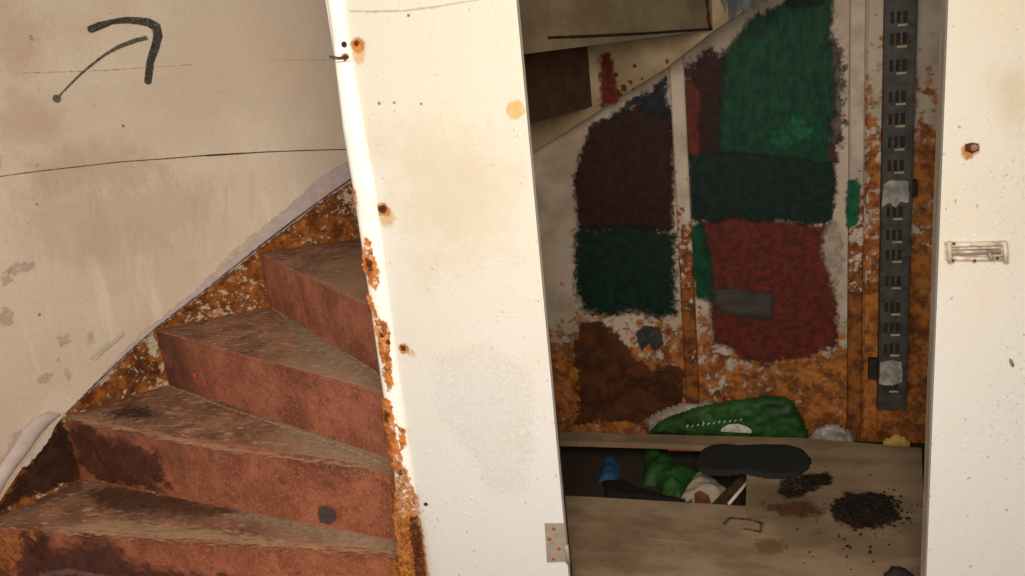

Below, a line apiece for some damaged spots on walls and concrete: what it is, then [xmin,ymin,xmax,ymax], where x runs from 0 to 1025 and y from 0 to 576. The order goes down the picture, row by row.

corrosion [342,38,364,62]
corrosion [962,143,979,159]
corrosion [377,203,393,224]
corrosion [573,321,685,425]
corrosion [362,237,429,576]
corrosion [0,422,232,513]
corrosion [318,505,336,525]
corrosion [0,529,202,576]